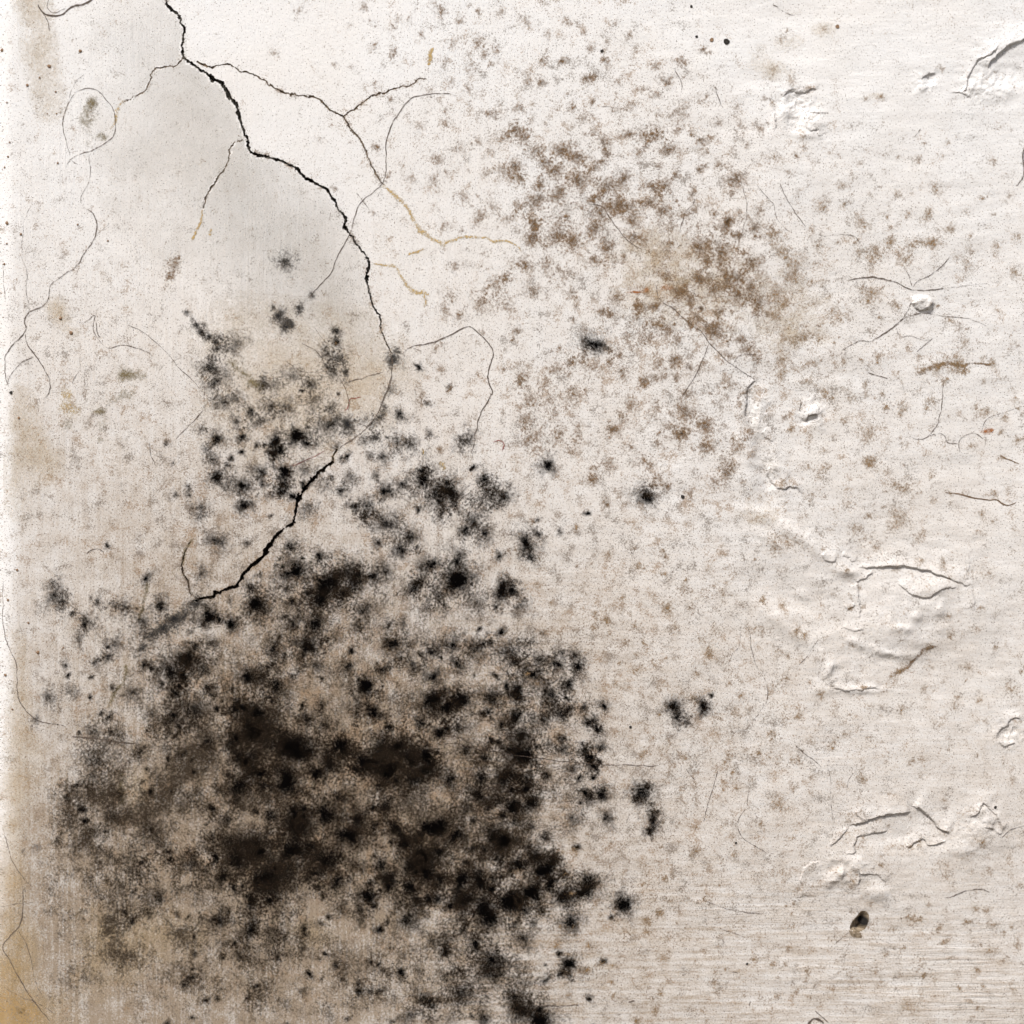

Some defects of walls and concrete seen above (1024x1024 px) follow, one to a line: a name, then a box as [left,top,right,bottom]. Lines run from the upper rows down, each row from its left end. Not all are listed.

spalling [951,23,1024,112]
mould [386,105,799,362]
crack [3,0,494,602]
mould [272,292,314,332]
mould [550,337,625,399]
mould [655,355,713,452]
mould [634,458,670,504]
leakage [47,311,613,1024]
mould [658,689,713,724]
mould [630,783,659,836]
mould [609,891,634,919]
peeling [790,791,1015,938]